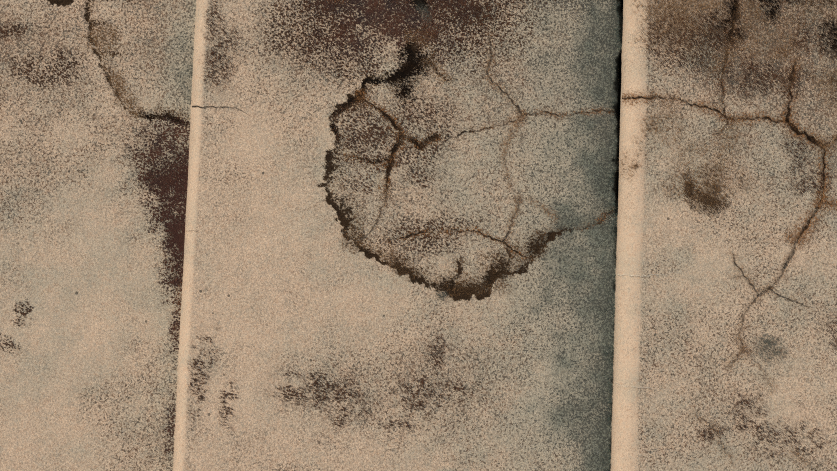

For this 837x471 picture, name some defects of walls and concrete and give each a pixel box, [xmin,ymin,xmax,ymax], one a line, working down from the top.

crack [83,0,245,127]
leakage [633,0,837,111]
leakage [317,0,572,301]
crack [343,0,837,388]
leakage [602,0,683,471]
leakage [784,137,834,196]
leakage [755,334,786,362]
leakage [698,392,825,467]